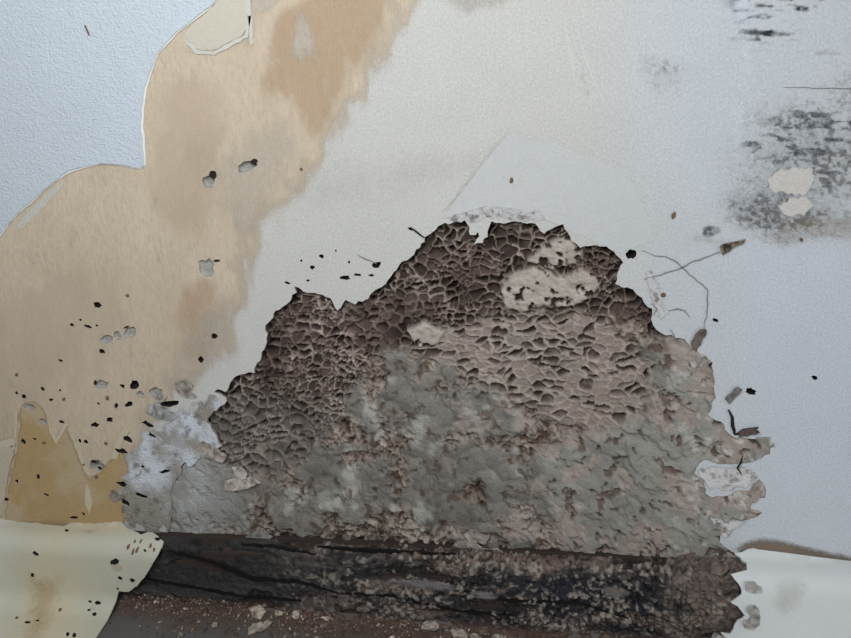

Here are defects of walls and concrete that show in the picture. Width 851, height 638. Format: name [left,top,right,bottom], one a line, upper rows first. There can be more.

leakage [740,112,851,230]
leakage [0,0,415,519]
crack [642,239,746,343]
leakage [604,311,669,363]
peeling [136,387,180,421]
peeling [222,465,260,492]
leakage [169,347,588,550]
spalling [539,329,775,558]
crack [241,543,460,556]
crack [144,550,629,619]
peeling [248,620,273,635]
peeling [421,621,439,631]